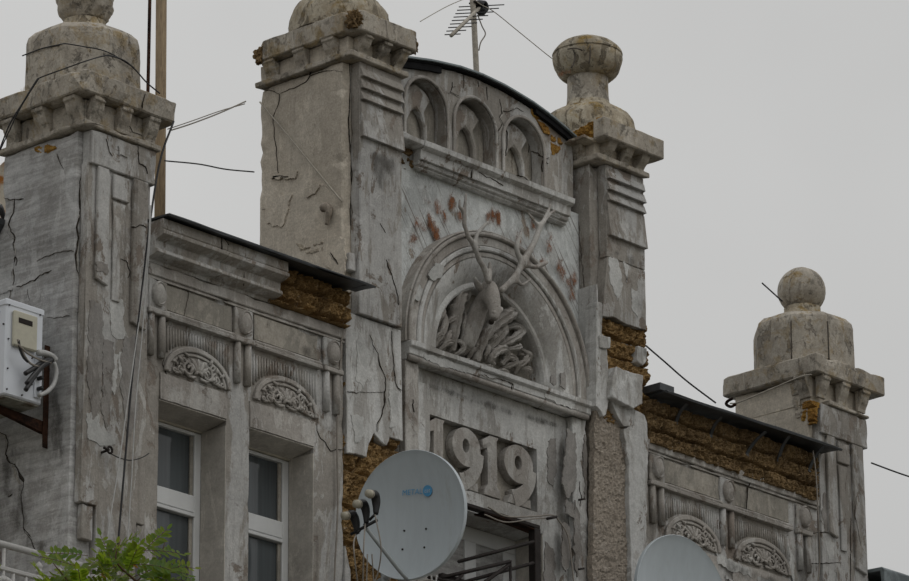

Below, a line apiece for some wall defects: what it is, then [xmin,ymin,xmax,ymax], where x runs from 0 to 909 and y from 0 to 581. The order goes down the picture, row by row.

crack [262,64,352,233]
crack [4,154,81,298]
rust [409,196,461,243]
peeling [608,257,639,317]
crack [0,432,36,550]
flaking render [341,414,400,581]
crack [347,331,415,431]
peeling [388,389,398,428]
peeling [423,353,469,374]
flaking render [543,318,651,581]
flaking render [789,381,820,425]